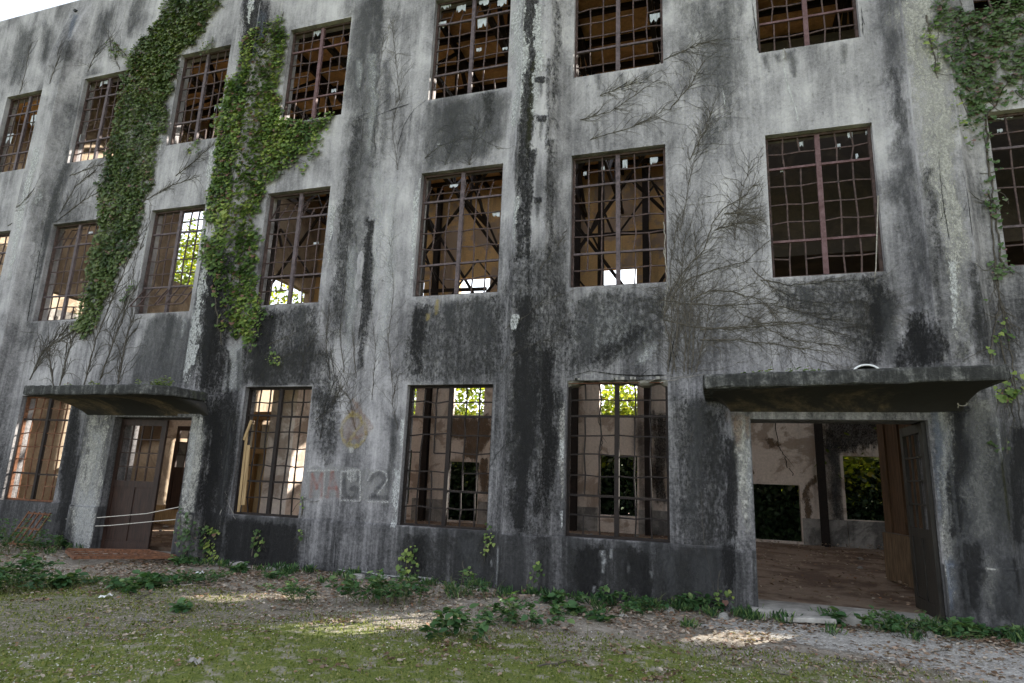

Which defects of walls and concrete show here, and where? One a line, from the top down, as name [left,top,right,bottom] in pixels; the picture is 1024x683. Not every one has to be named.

damp [132,252,339,567]
damp [329,0,388,369]
damp [397,532,503,585]
damp [404,0,664,547]
damp [776,91,989,368]
damp [934,407,1024,623]